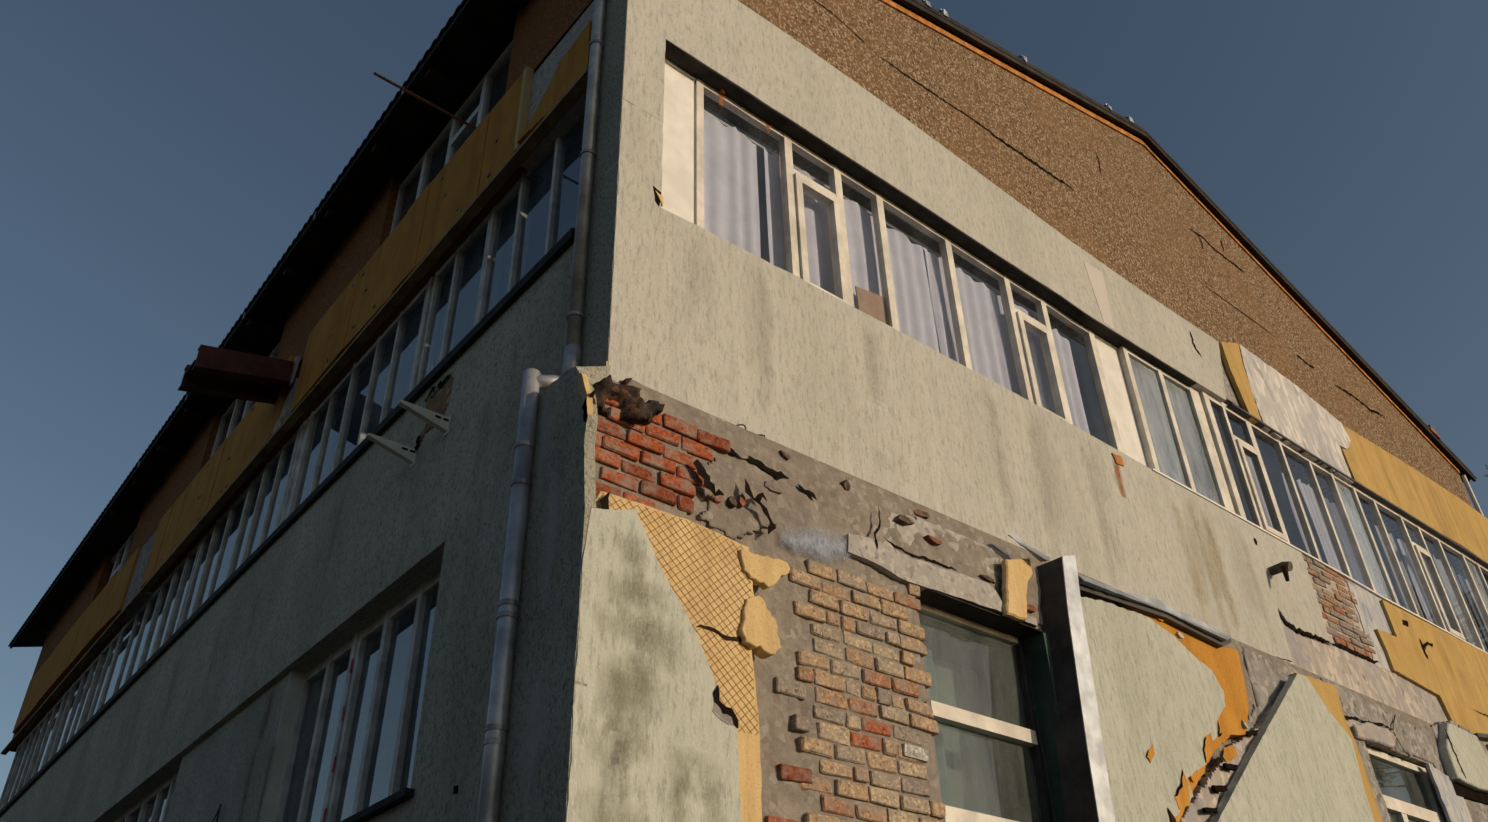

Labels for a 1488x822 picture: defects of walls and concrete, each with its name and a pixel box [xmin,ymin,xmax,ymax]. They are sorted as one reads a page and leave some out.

crack [814,0,1101,192]
peeling [710,493,746,509]
peeling [870,509,1010,588]
peeling [738,549,790,659]
flaking render [1279,554,1378,663]
flaking render [712,685,739,728]
flaking render [1121,607,1488,822]